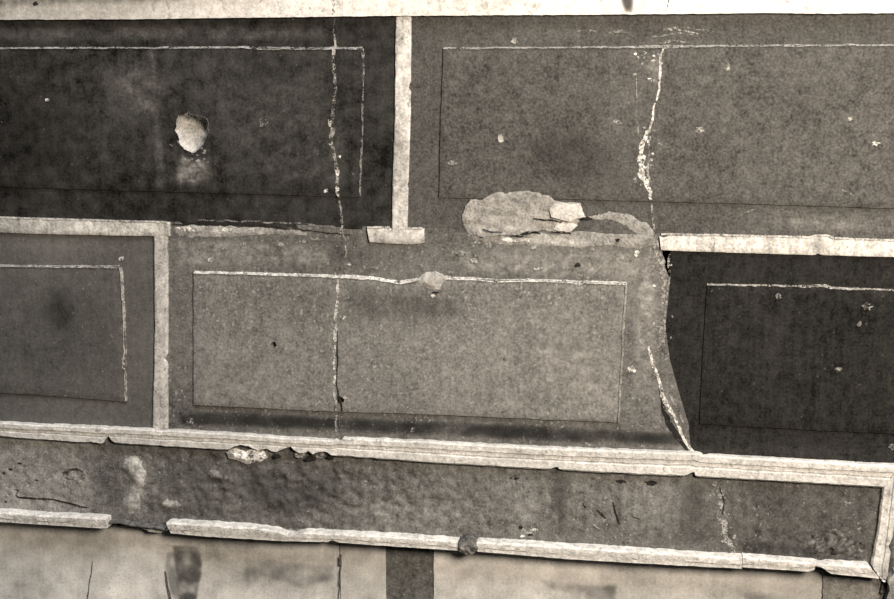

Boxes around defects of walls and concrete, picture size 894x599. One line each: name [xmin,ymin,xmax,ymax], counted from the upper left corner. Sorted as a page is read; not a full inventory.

crack [324,0,351,436]
flaking render [455,191,656,263]
crack [613,49,694,451]
spalling [226,448,281,464]
spalling [294,452,334,461]
leakage [164,547,201,599]
peeling [822,567,894,599]